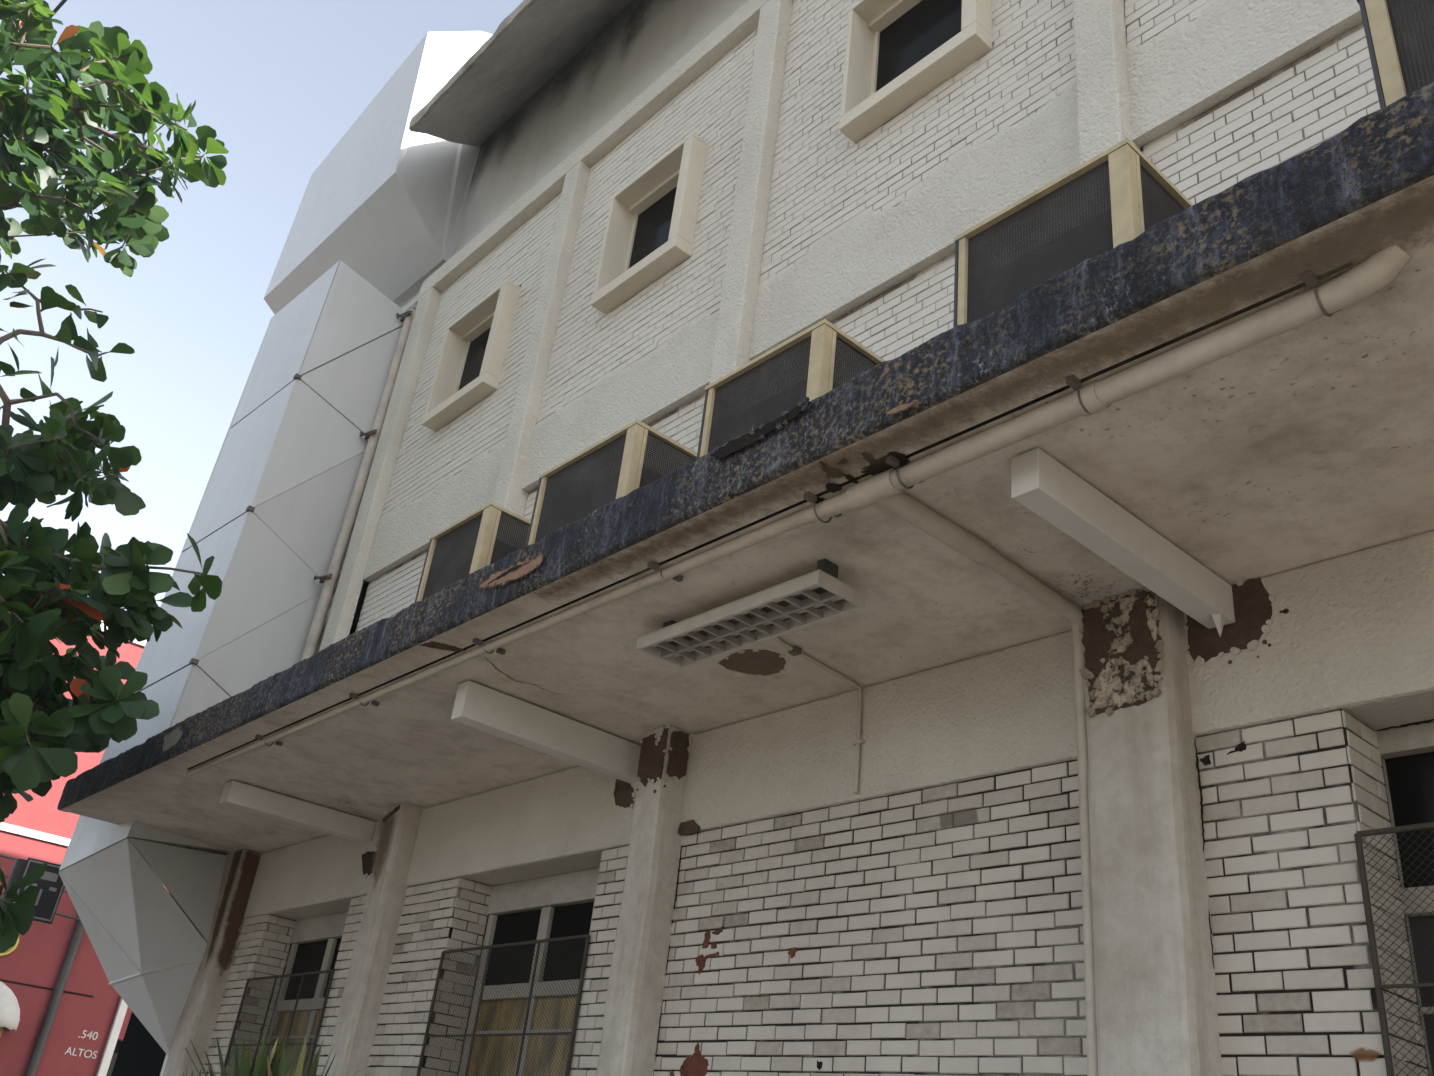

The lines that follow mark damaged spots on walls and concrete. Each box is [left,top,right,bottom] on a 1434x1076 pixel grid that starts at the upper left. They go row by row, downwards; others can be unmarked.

damp [477,0,644,162]
damp [540,186,1434,595]
spalling [718,648,786,678]
peeling [1079,586,1165,717]
spalling [1184,578,1289,668]
spalling [613,724,693,809]
spalling [678,820,700,836]
peeling [695,926,723,975]
peeling [670,1042,709,1076]